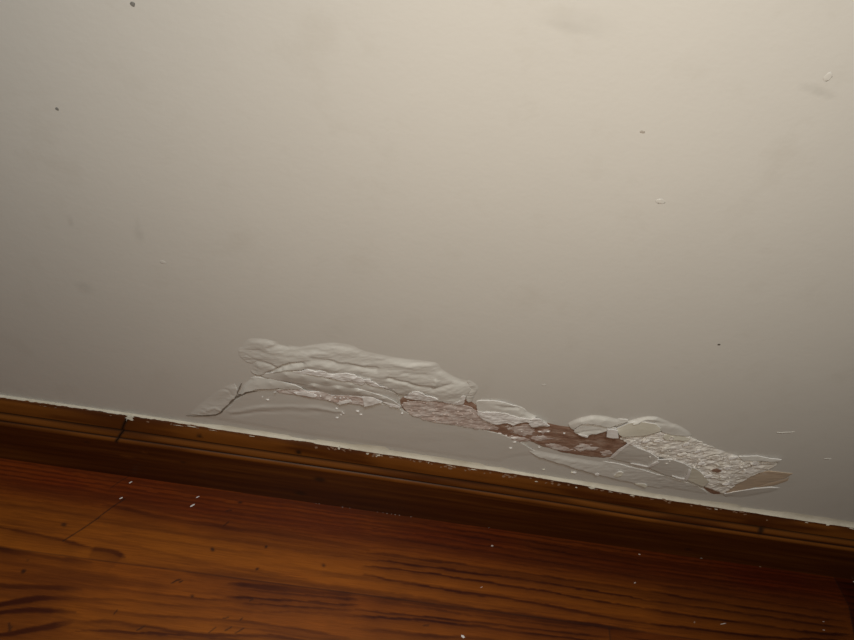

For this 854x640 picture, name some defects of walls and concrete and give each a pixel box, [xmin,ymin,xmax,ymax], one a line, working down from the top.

peeling [400,397,793,497]